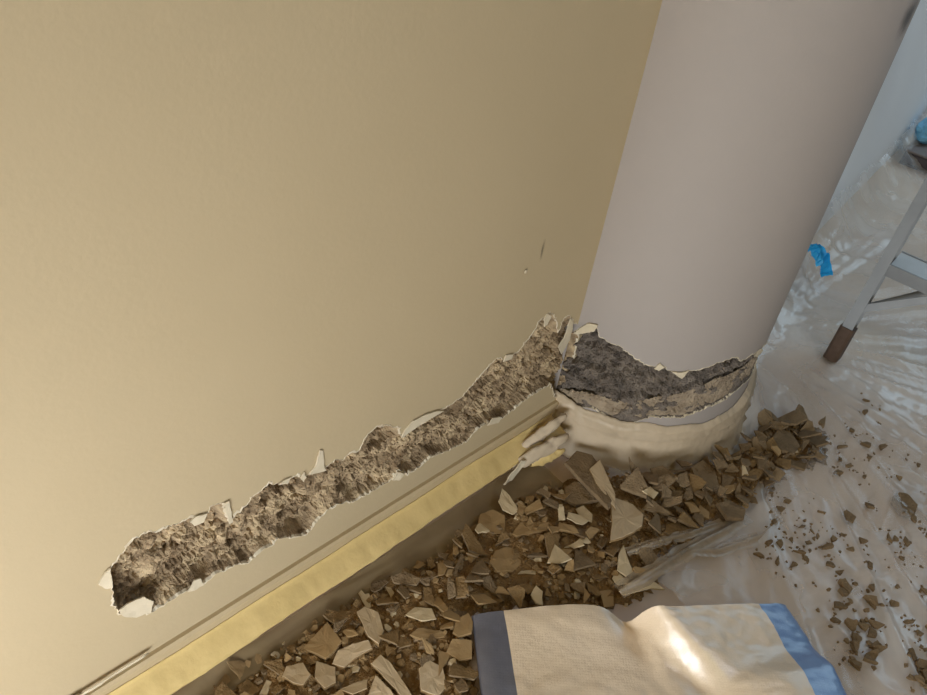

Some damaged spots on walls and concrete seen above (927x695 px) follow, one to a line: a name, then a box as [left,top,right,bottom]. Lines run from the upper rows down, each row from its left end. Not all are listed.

spalling [98,312,767,618]